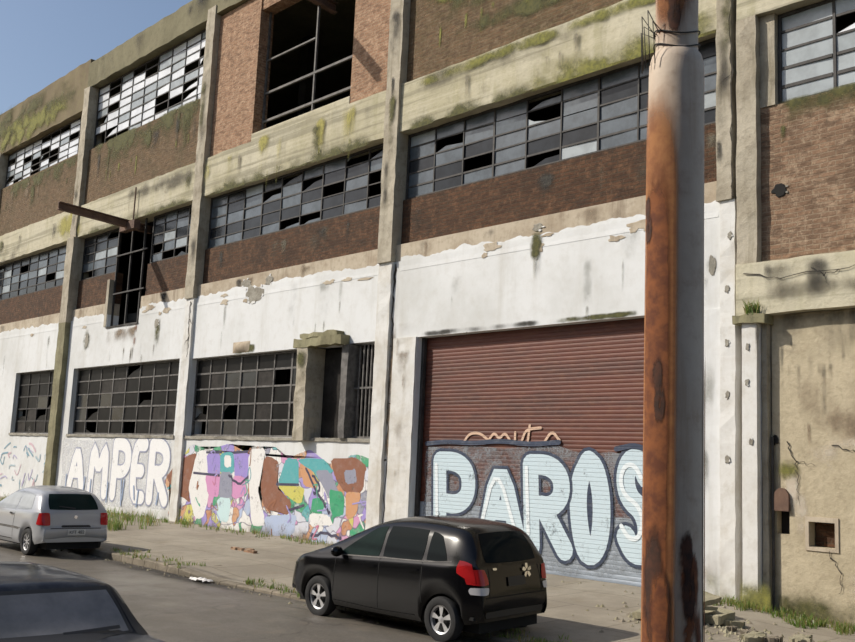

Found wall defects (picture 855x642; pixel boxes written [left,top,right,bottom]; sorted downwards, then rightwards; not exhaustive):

corrosion [657,0,686,31]
crack [719,0,734,194]
peeling [704,200,719,219]
peeling [400,214,646,271]
peeling [197,264,379,306]
crack [743,265,854,284]
peeling [72,314,104,348]
peeling [140,297,186,328]
corrosion [641,106,705,642]
crack [786,441,814,504]